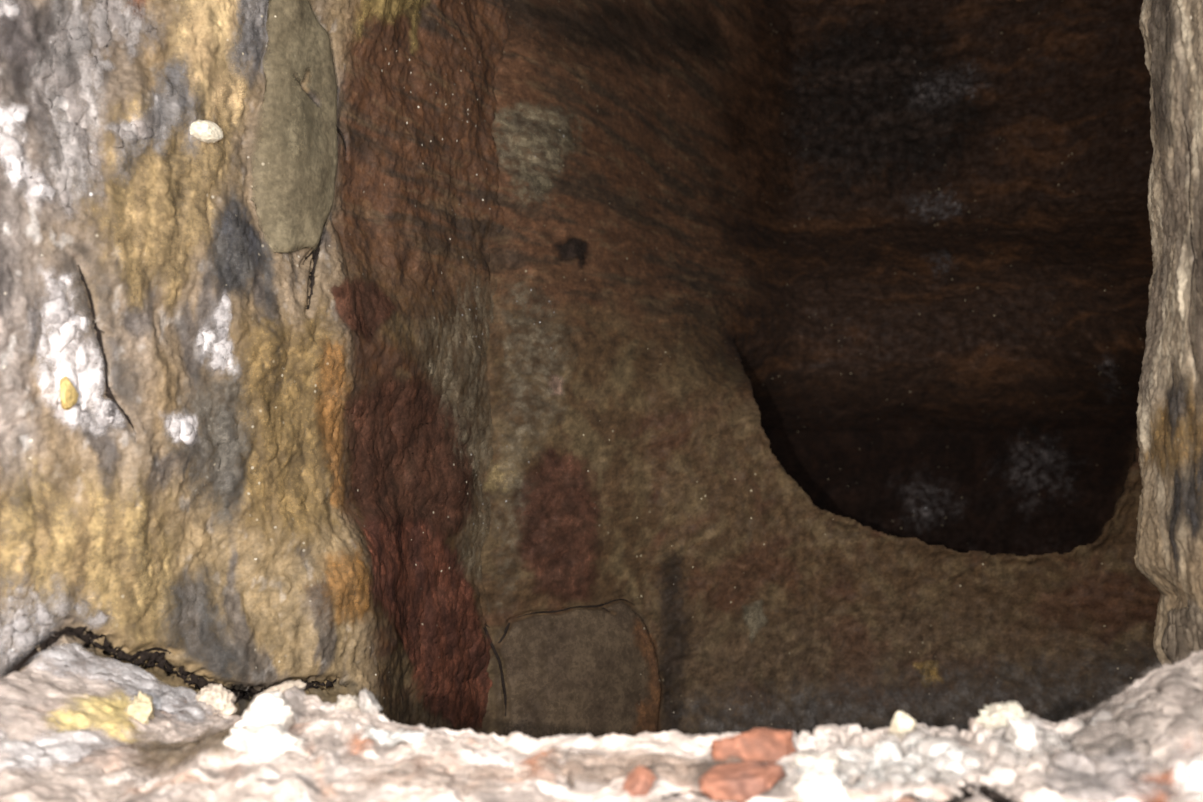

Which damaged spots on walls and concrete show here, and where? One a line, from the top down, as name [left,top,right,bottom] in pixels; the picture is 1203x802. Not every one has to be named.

crack [78,265,136,434]
leakage [1146,204,1203,566]
crack [4,626,336,702]